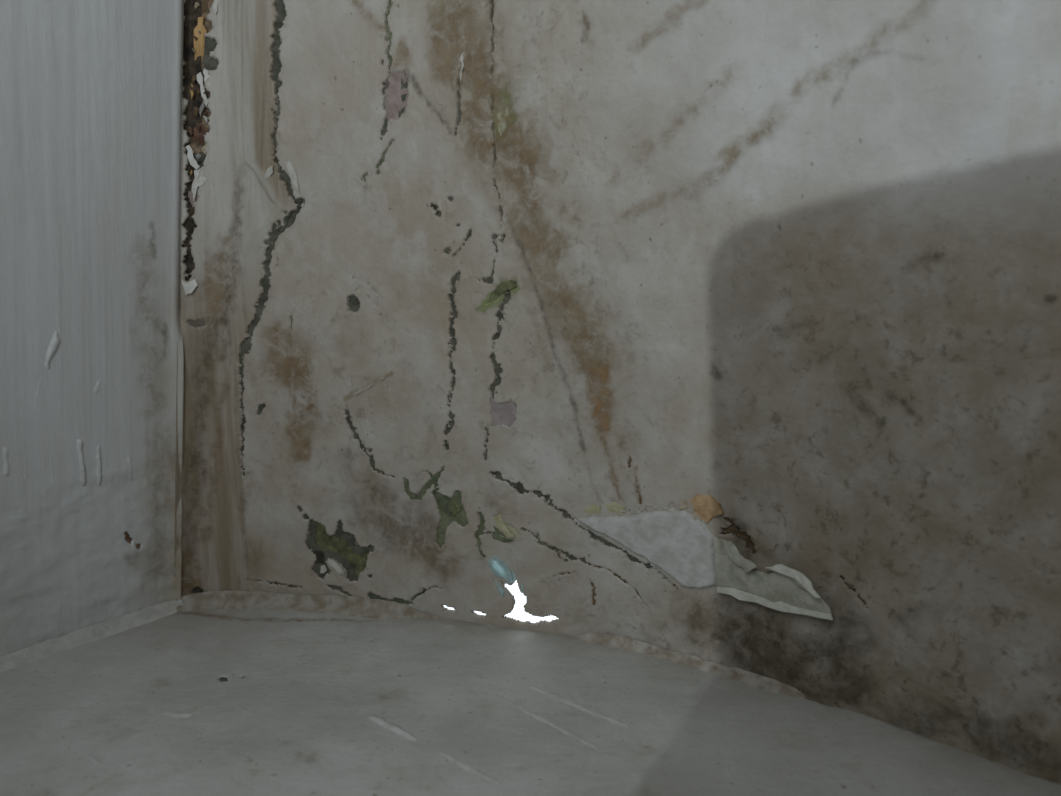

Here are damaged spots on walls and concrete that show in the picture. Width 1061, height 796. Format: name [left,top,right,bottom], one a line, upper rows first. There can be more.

spalling [182,0,219,295]
crack [239,0,305,476]
crack [360,0,409,186]
crack [431,0,676,605]
peeling [298,506,374,589]
crack [345,410,395,477]
peeling [403,470,468,548]
peeling [713,530,833,620]